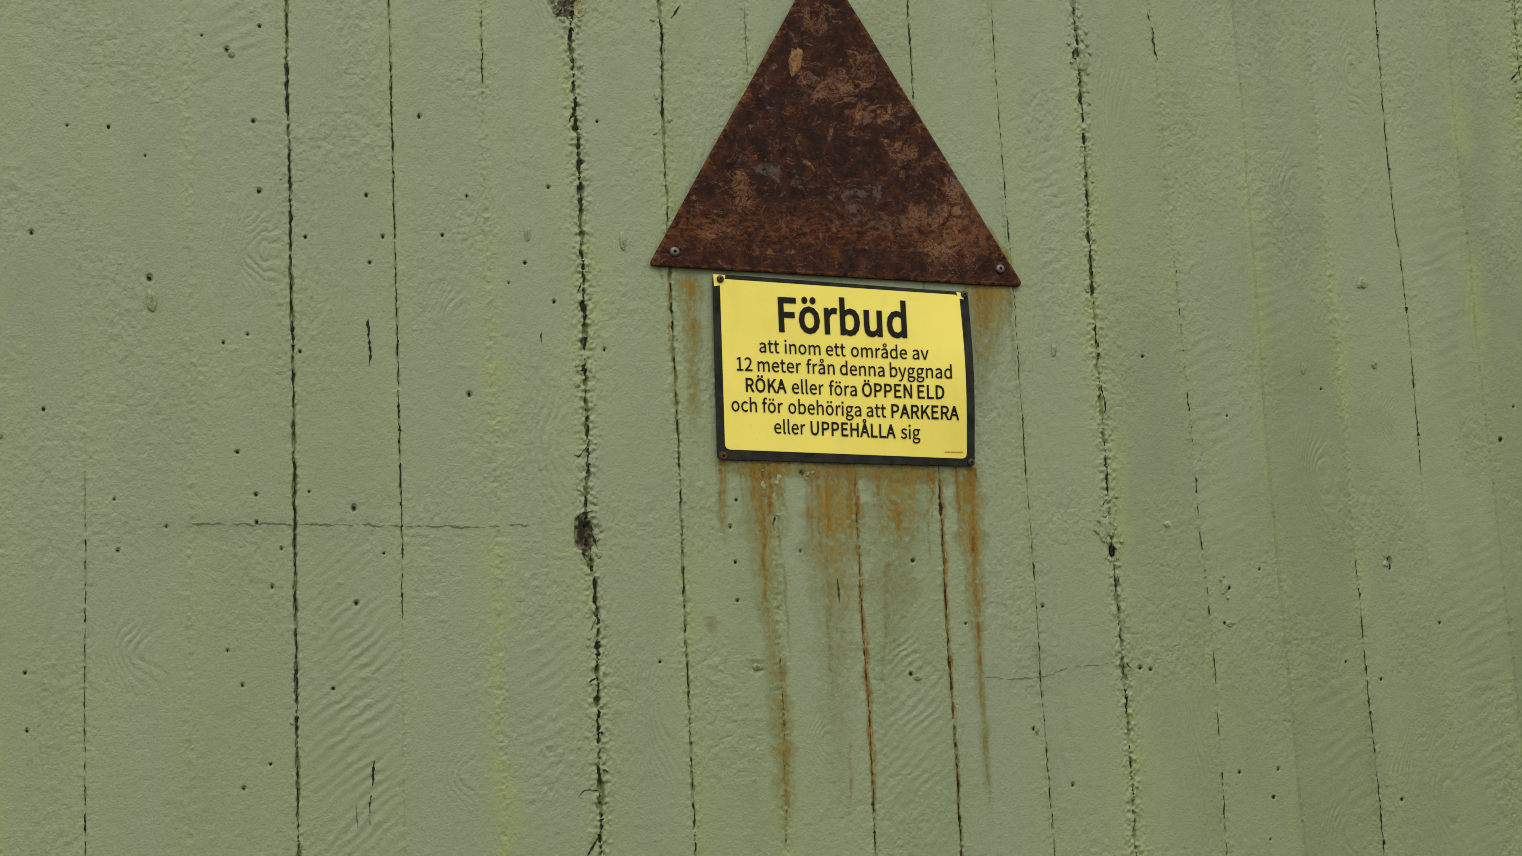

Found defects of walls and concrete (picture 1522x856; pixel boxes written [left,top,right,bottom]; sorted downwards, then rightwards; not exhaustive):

corrosion [660,274,699,402]
corrosion [965,285,1011,359]
corrosion [719,461,983,793]